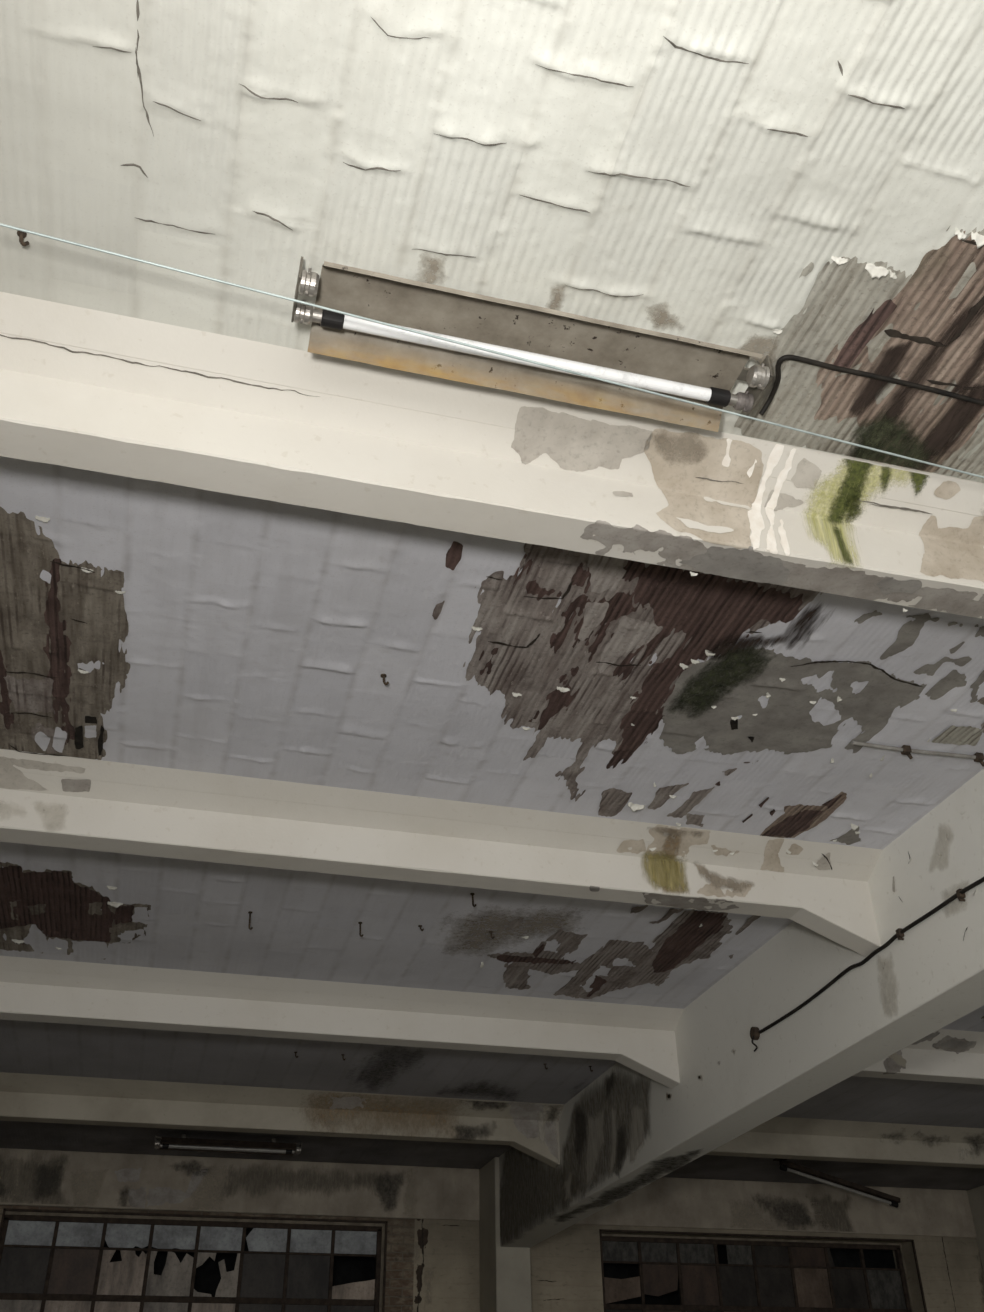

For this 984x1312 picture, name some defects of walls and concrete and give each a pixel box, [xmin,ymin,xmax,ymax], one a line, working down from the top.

crack [93,0,201,136]
crack [538,65,633,87]
crack [520,195,590,213]
crack [589,171,690,187]
crack [0,334,320,397]
damp [722,439,732,467]
damp [747,444,822,556]
crack [862,501,931,514]
peeling [0,507,130,792]
peeling [463,225,984,999]
peeling [0,862,151,960]
damp [458,1074,699,1245]